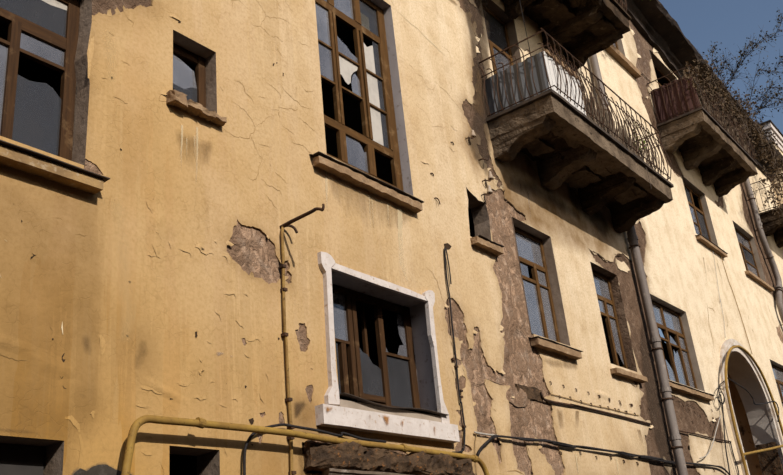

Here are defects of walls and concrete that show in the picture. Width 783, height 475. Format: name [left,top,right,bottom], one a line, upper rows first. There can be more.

flaking render [92,0,151,17]
crack [221,83,313,207]
flaking render [629,20,683,178]
peeling [226,221,291,284]
flaking render [444,0,564,475]
peeling [295,323,309,352]
flaking render [590,220,723,475]